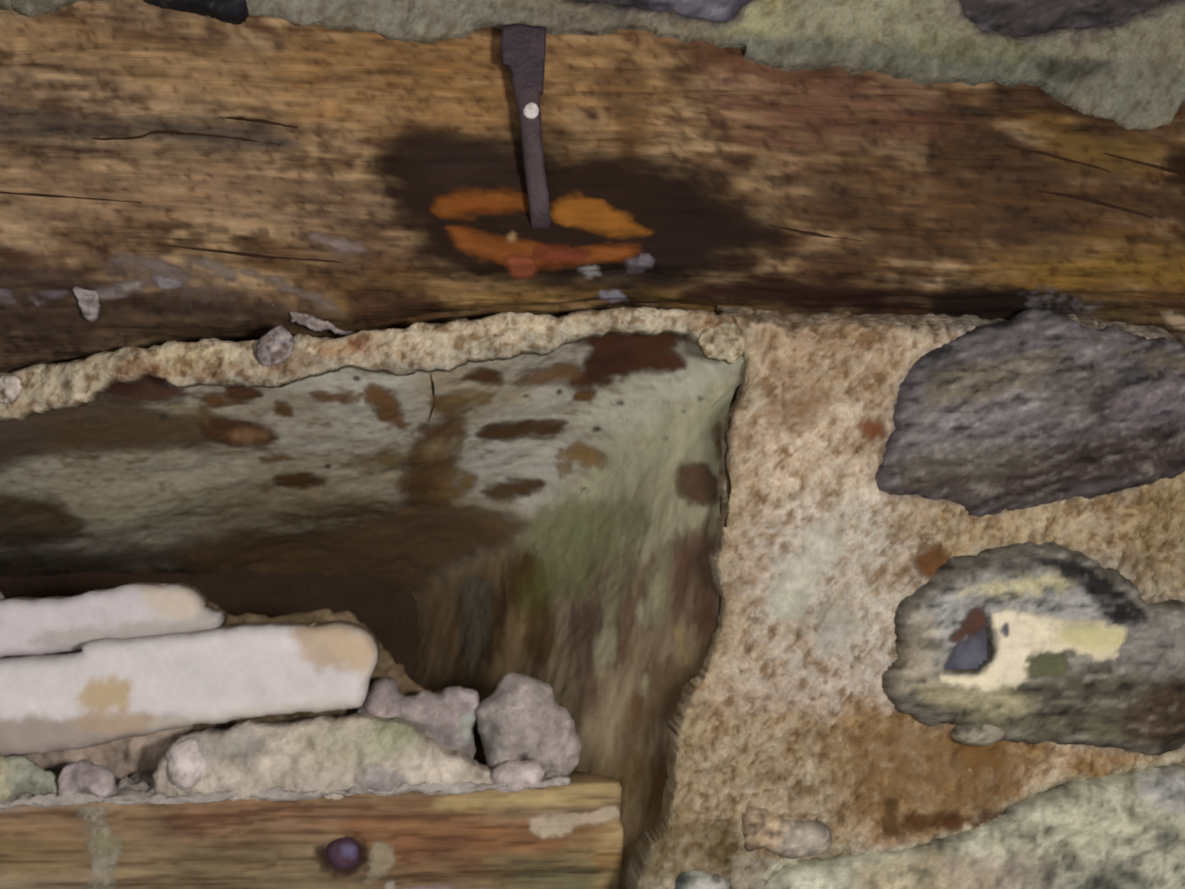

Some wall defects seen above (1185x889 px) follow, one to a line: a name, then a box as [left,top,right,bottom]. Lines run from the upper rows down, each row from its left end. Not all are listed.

corrosion [432,190,651,279]
damp [374,131,883,315]